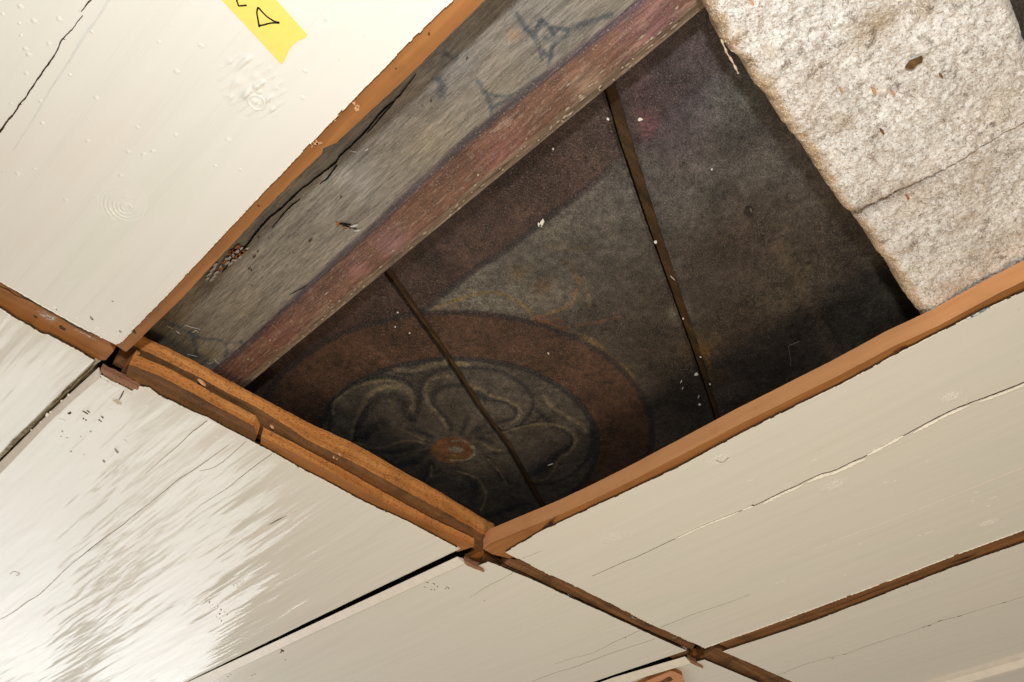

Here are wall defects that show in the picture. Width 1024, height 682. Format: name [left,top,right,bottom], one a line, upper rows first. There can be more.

crack [0,0,91,133]